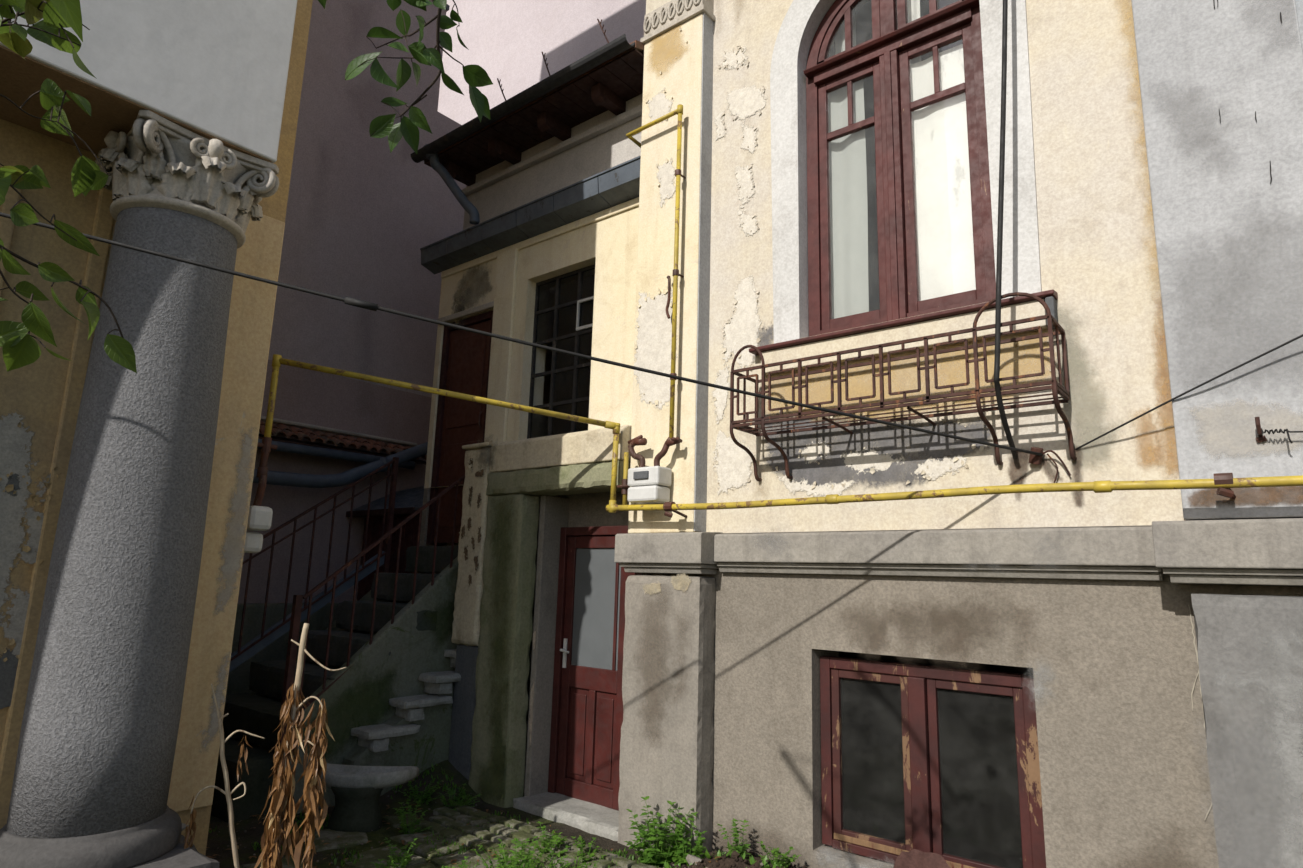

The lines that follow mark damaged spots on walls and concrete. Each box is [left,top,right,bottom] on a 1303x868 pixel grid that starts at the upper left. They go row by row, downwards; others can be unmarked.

peeling [645,28,687,122]
peeling [718,46,749,70]
peeling [655,158,676,207]
peeling [714,85,767,236]
peeling [634,286,678,410]
peeling [0,412,67,709]